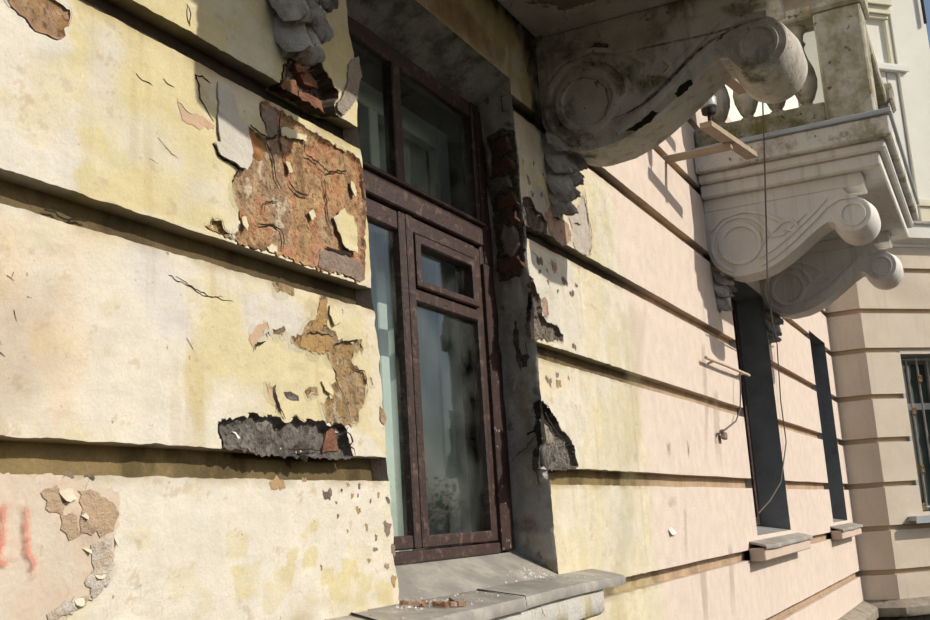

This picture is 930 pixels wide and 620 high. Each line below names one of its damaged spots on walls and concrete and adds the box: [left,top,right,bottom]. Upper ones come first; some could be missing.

flaking render [4,0,74,40]
crack [195,74,213,120]
crack [213,142,242,171]
flaking render [206,82,367,284]
flaking render [486,128,592,350]
crack [169,275,234,302]
flaking render [218,297,375,462]
flaking render [532,399,578,471]